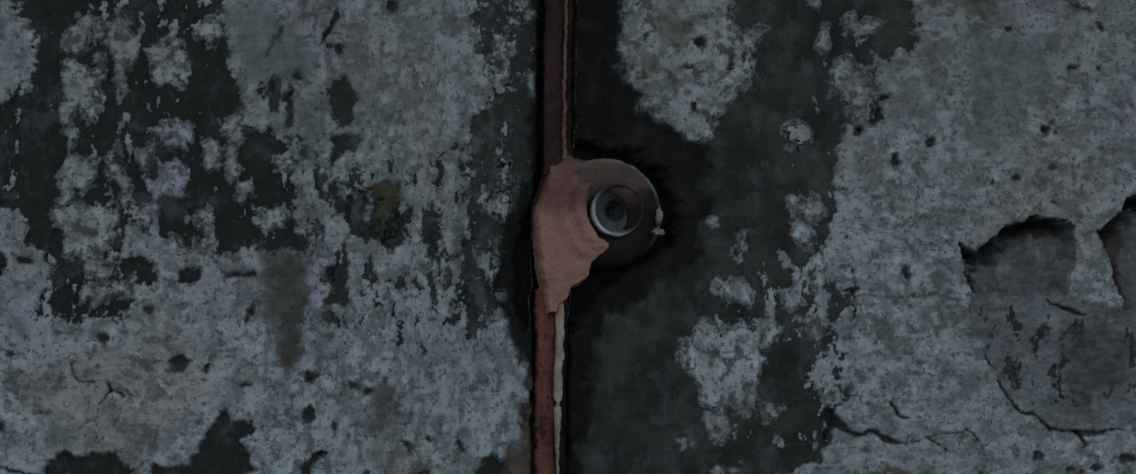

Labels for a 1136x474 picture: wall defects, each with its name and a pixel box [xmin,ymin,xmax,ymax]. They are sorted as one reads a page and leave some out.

damp [261,247,309,369]
crack [842,287,860,298]
crack [1047,300,1086,315]
peeling [45,451,134,474]
peeling [152,409,258,474]
crack [821,402,948,451]
crack [985,356,1114,448]